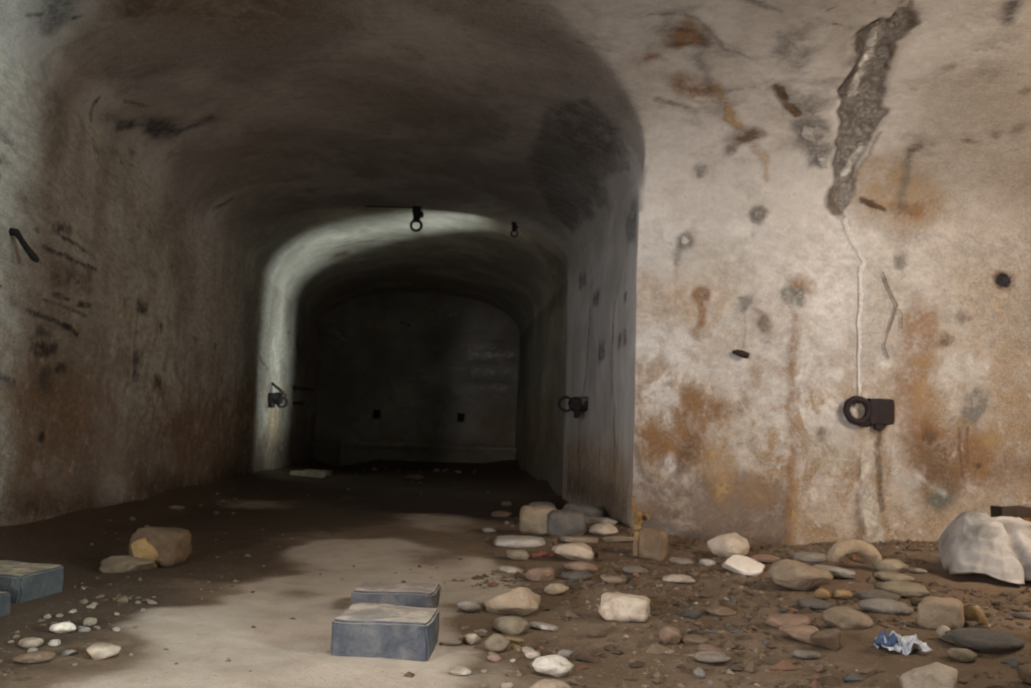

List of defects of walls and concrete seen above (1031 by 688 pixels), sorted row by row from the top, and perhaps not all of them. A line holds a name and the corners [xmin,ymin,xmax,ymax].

corrosion [669,22,719,48]
corrosion [677,78,763,152]
spalling [773,0,918,215]